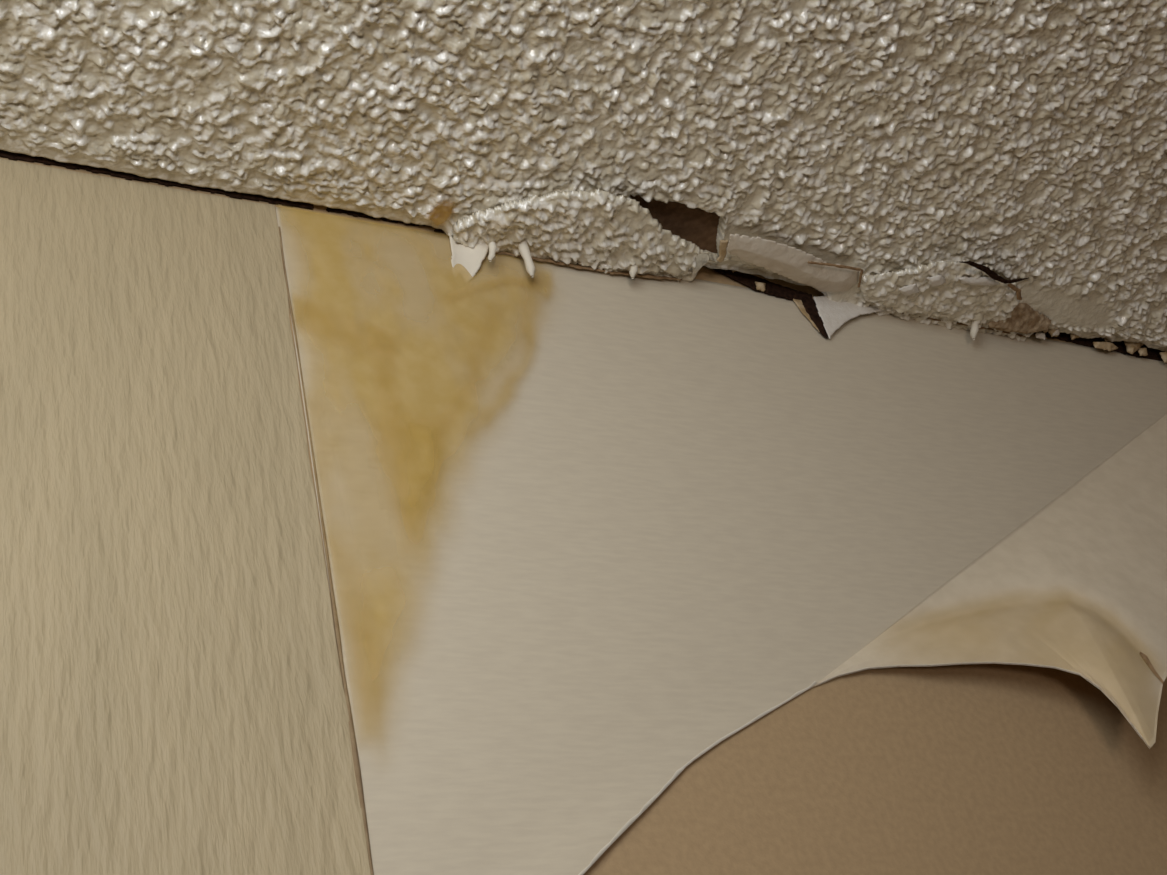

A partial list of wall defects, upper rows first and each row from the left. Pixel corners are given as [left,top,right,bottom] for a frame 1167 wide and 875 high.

leakage [287,208,522,532]
peeling [809,413,1167,749]